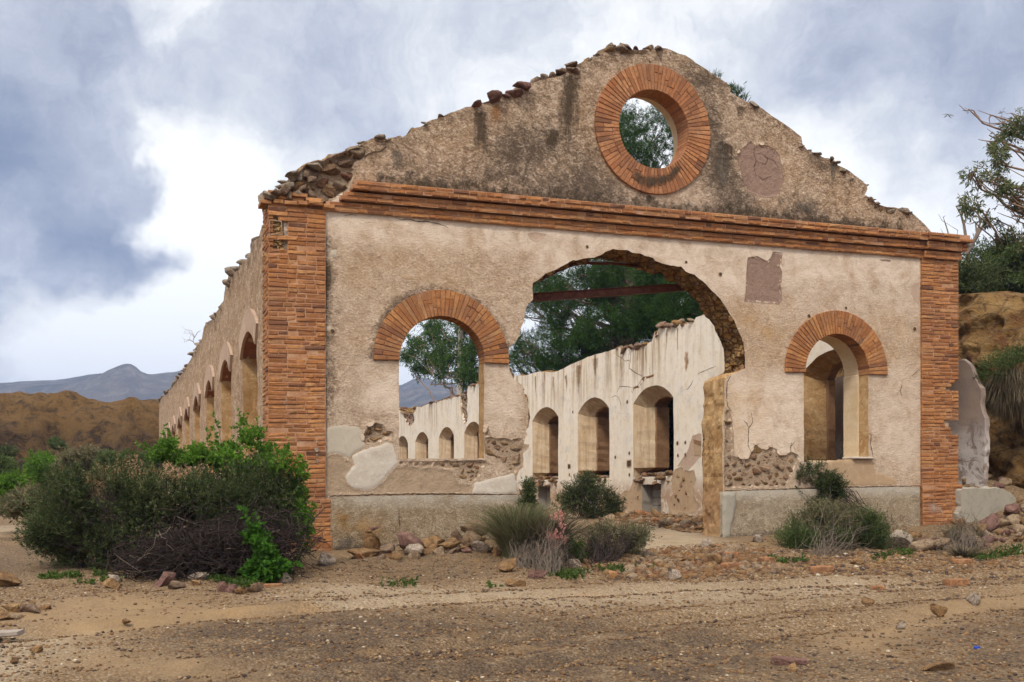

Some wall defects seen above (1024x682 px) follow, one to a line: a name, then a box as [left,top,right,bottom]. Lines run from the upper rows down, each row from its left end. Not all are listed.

damp [474,112,488,150]
damp [547,75,578,148]
damp [376,150,903,230]
peeling [744,252,785,304]
crack [613,350,654,403]
spalling [361,421,393,445]
peeling [326,454,481,495]
peeling [669,433,702,514]